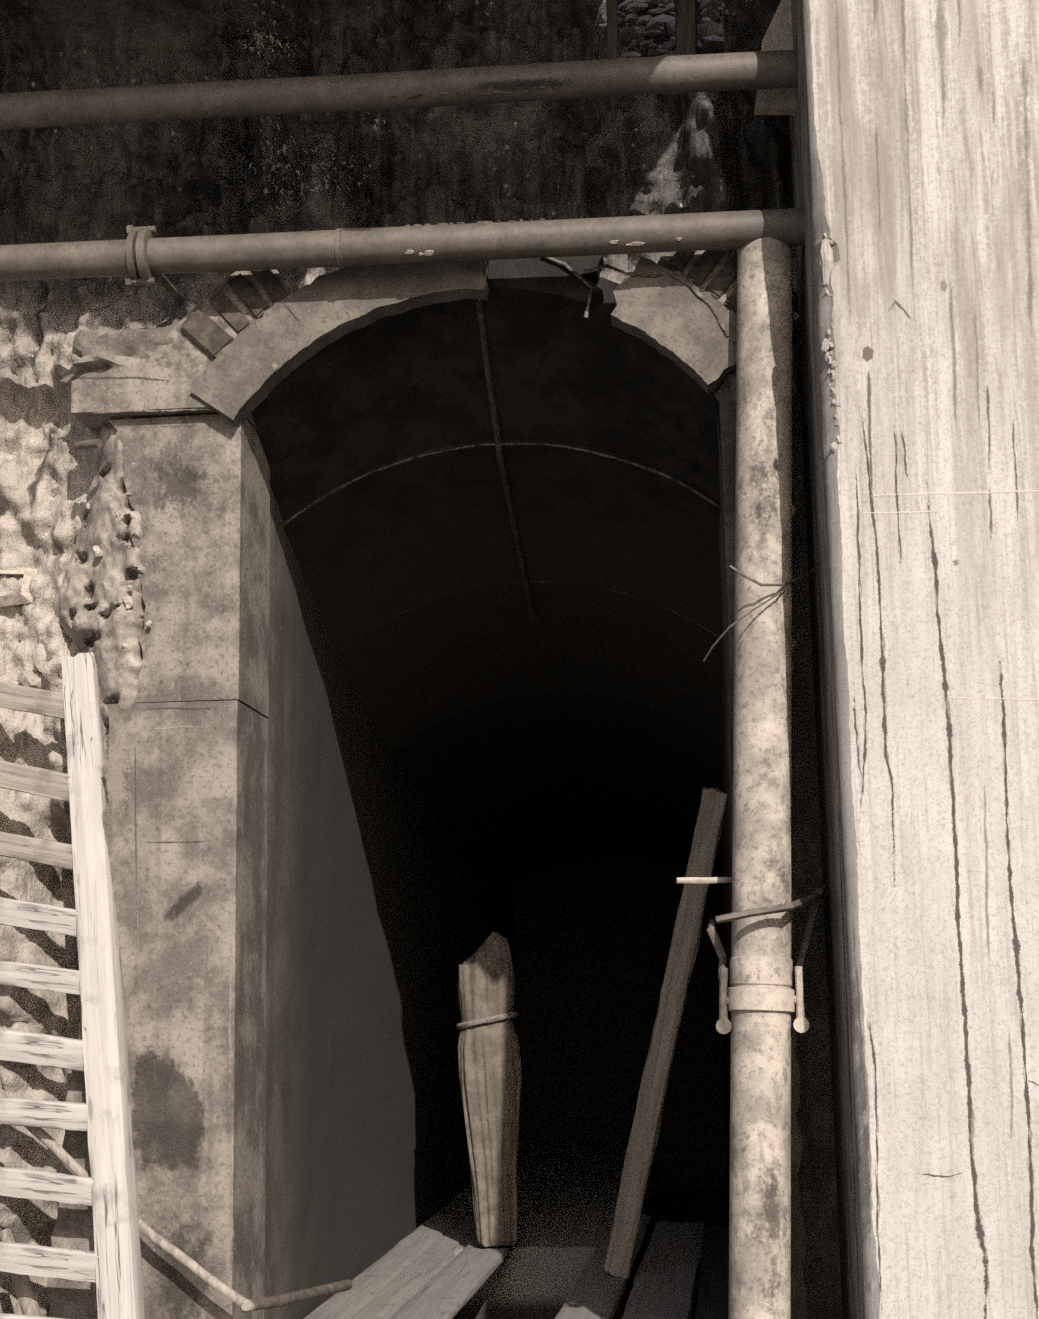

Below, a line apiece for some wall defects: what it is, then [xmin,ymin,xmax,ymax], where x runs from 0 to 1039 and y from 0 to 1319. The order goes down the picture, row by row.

spalling [714,369,736,402]
spalling [57,417,152,725]
crack [852,421,989,1319]